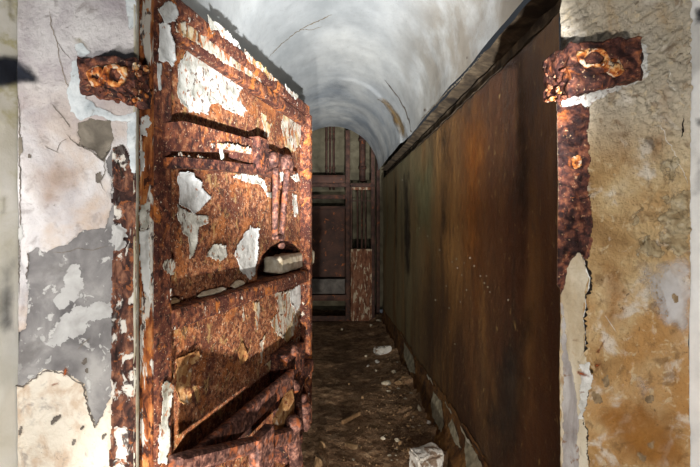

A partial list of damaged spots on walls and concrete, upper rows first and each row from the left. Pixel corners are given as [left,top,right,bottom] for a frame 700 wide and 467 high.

peeling [157,1,299,117]
crack [267,14,332,60]
crack [387,54,483,132]
peeling [217,143,252,161]
peeling [261,112,272,137]
peeling [281,114,301,152]
peeling [233,173,272,198]
peeling [177,171,212,259]
flaking render [16,43,152,467]
peeling [206,225,260,280]
flaking render [557,43,650,467]
peeling [270,285,301,342]